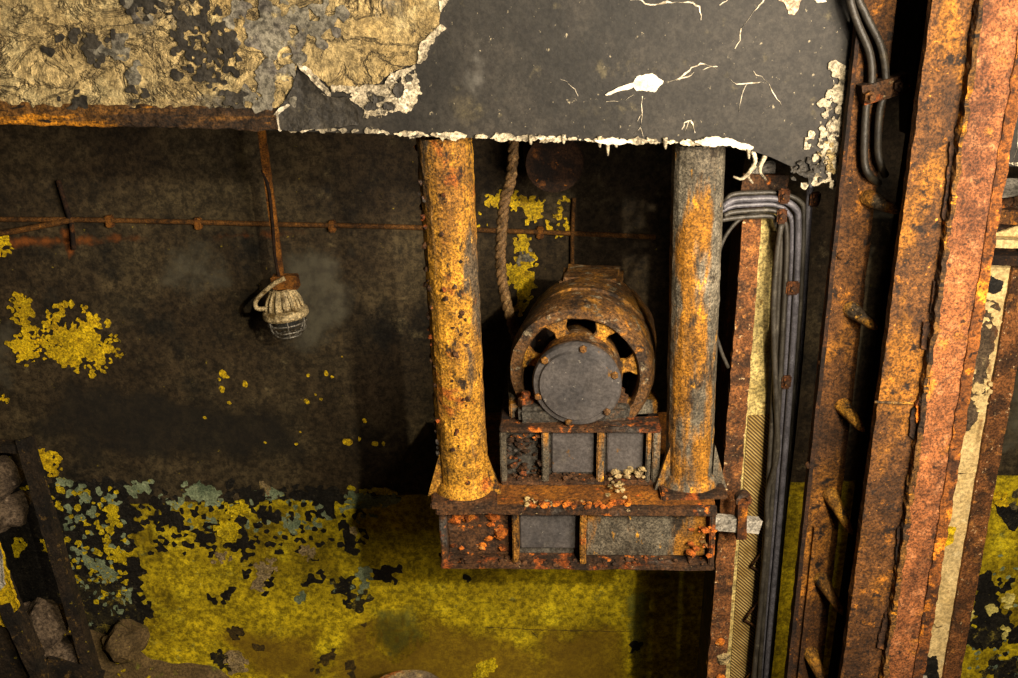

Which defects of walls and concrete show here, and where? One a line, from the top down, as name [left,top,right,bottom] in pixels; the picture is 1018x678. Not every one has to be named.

crack [641,0,727,16]
flaking render [0,0,448,132]
crack [664,63,781,108]
spalling [789,59,850,190]
spalling [733,151,768,184]
rust [423,267,458,368]
rust [446,310,470,359]
peeling [966,276,1004,431]
rust [433,414,460,456]
peeling [966,554,1018,678]
damp [226,635,317,678]
damp [332,620,623,678]